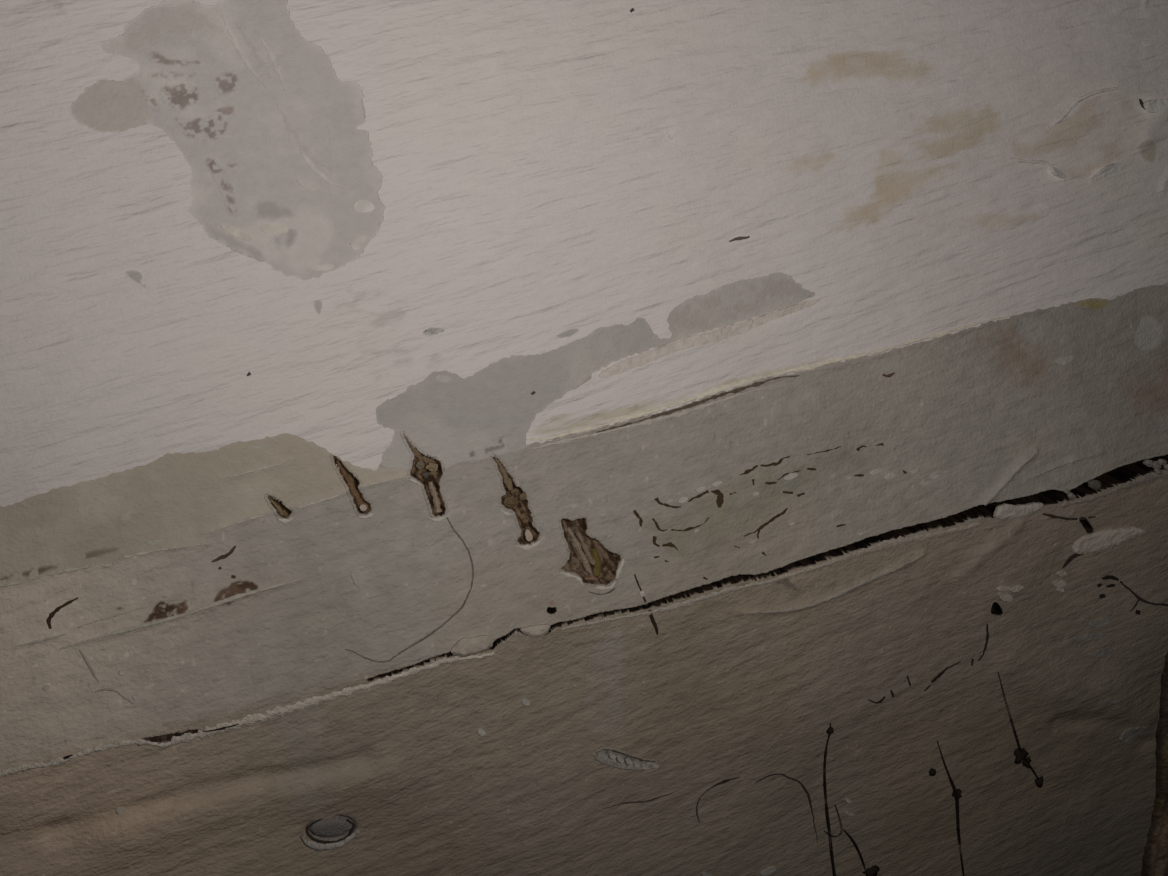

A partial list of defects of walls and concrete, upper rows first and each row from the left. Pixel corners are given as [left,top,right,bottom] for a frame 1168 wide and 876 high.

peeling [68,0,385,281]
corrosion [142,578,259,624]
peeling [0,270,821,591]
crack [0,452,1168,780]
peeling [633,441,941,580]